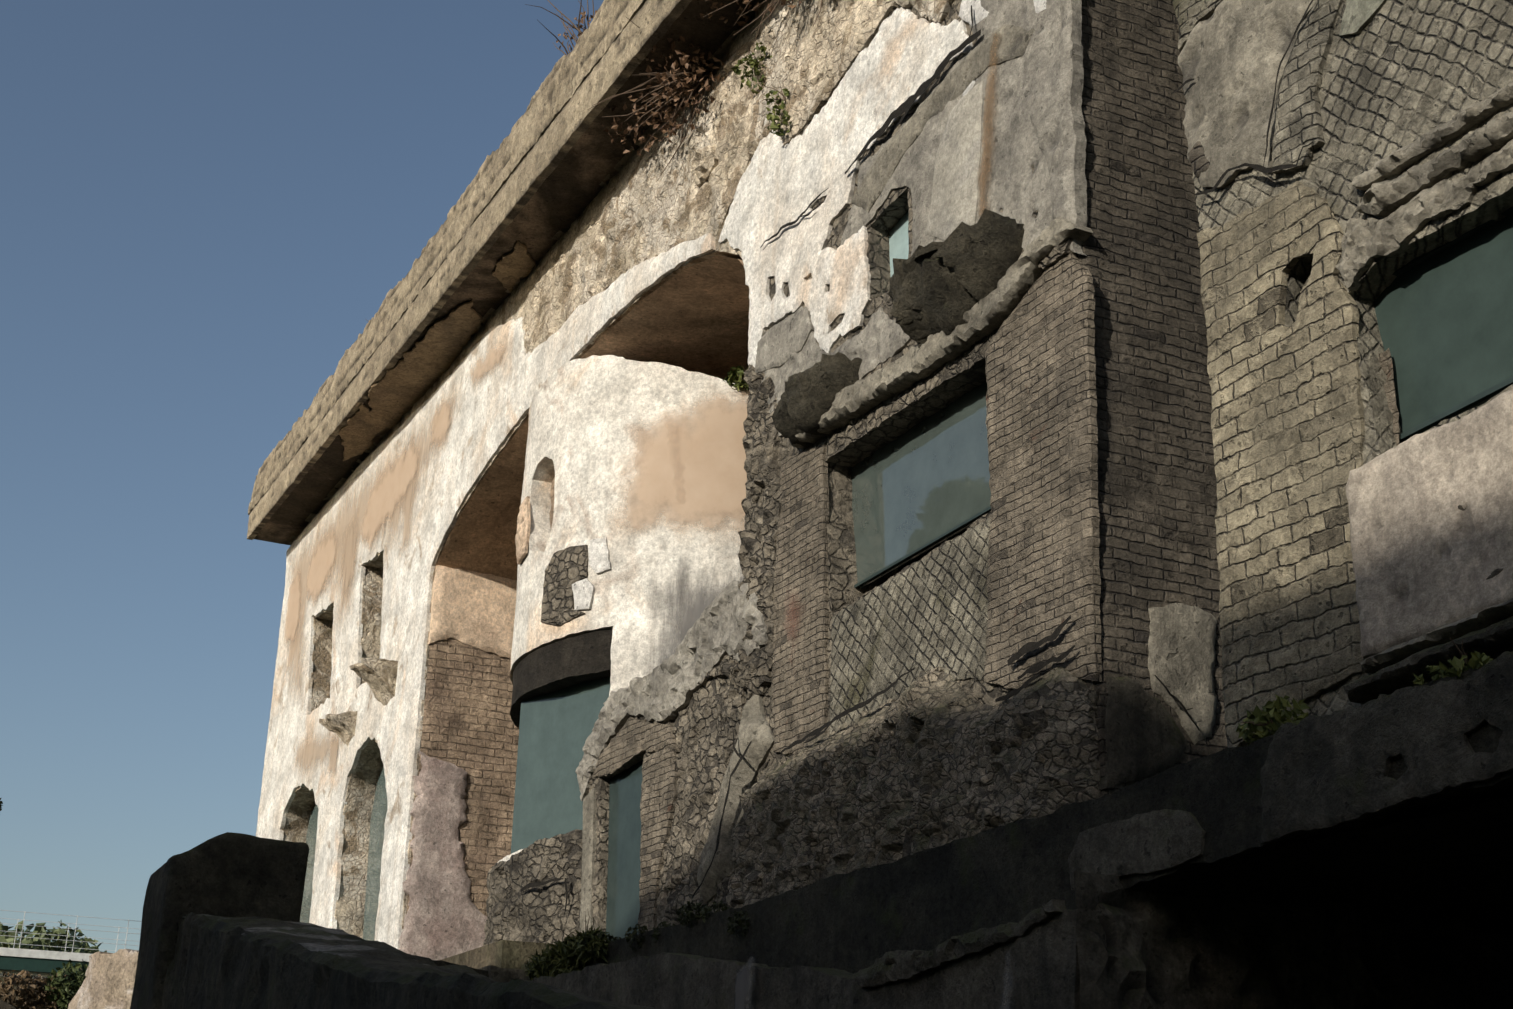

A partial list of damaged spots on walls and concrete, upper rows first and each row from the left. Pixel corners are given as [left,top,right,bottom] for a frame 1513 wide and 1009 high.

peeling [850,0,1047,241]
spalling [1188,141,1212,178]
water stain [288,424,434,685]